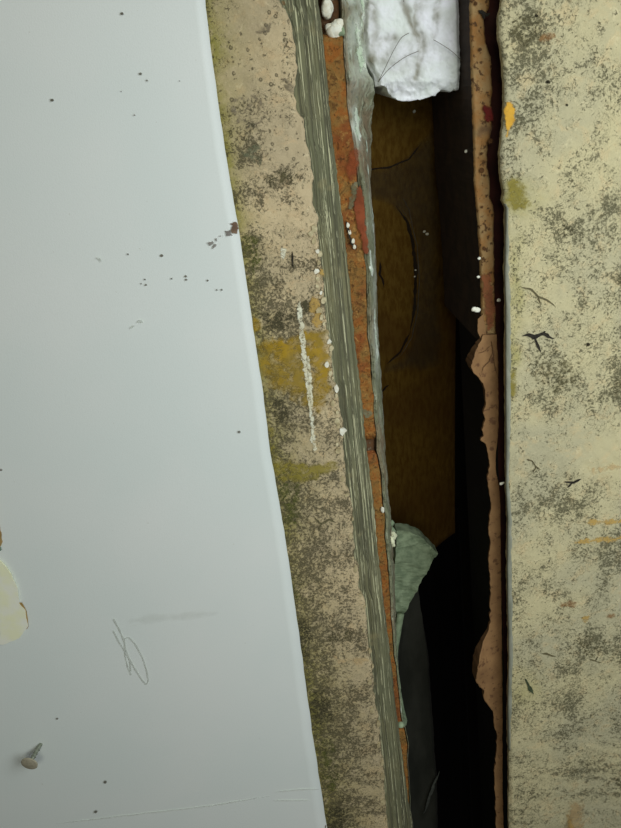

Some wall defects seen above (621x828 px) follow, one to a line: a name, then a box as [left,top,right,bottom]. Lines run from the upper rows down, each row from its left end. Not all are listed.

damp [505,14,545,47]
damp [504,102,515,137]
damp [506,179,527,210]
damp [354,186,369,254]
spalling [481,274,495,331]
crack [523,331,555,352]
damp [252,297,331,451]
damp [526,350,583,398]
damp [273,462,336,525]
damp [298,619,313,661]